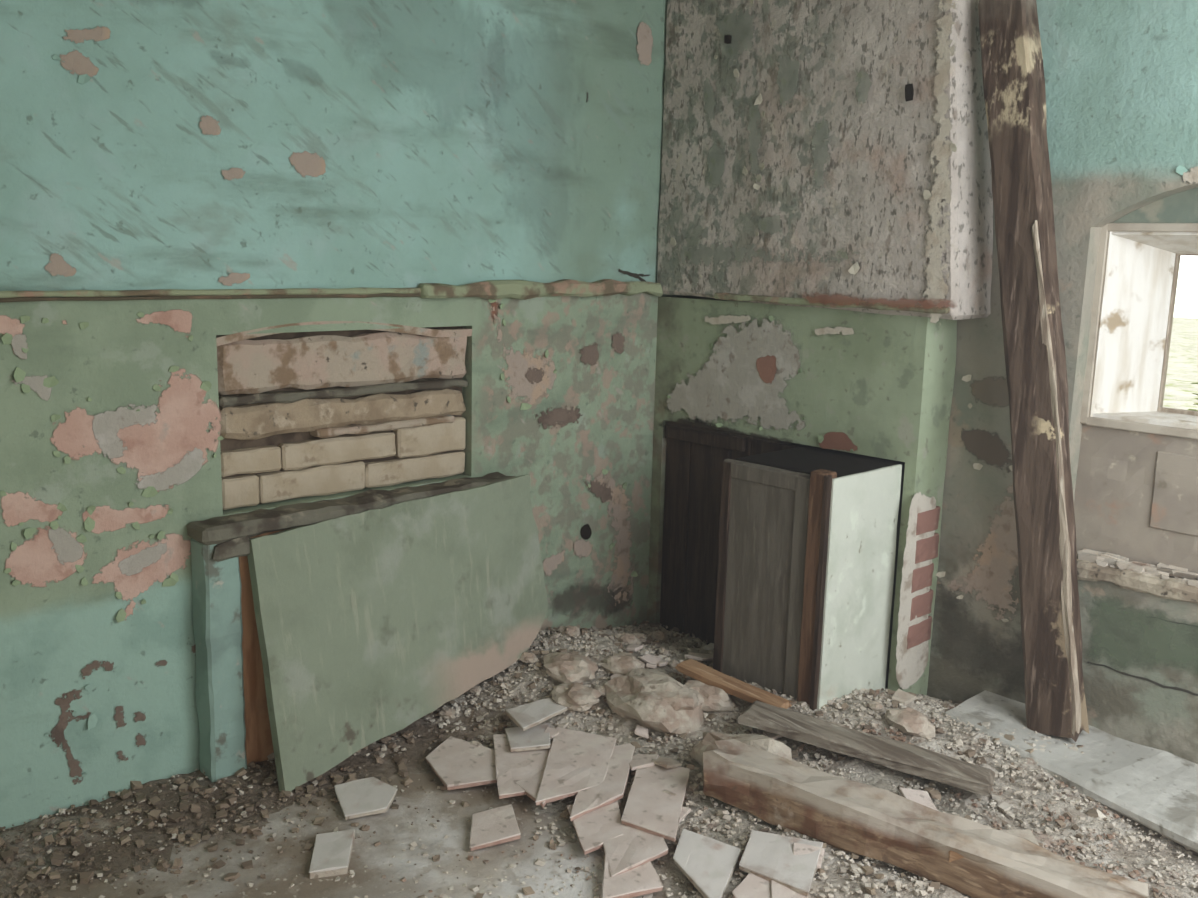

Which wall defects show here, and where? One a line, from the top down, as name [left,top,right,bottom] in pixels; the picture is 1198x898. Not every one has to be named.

peeling [52,26,110,85]
peeling [714,0,755,78]
peeling [289,151,326,178]
peeling [0,315,89,401]
peeling [136,310,194,342]
peeling [666,315,805,431]
spalling [817,432,858,453]
peeling [0,365,224,623]
spalling [896,428,1019,689]
crack [1087,661,1198,696]
spalling [44,660,114,785]
spalling [114,706,147,762]